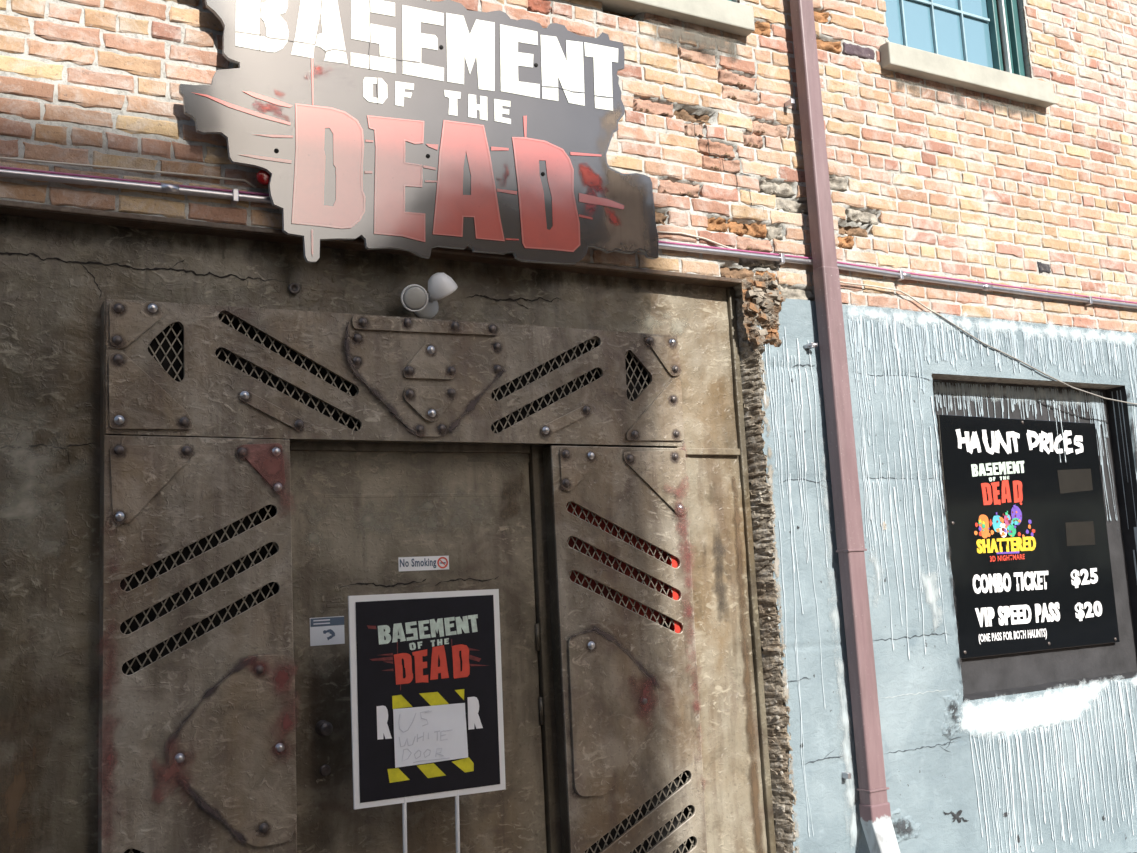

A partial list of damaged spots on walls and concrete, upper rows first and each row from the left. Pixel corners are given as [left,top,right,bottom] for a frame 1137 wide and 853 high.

spalling [633,99,788,174]
spalling [655,211,668,225]
spalling [657,179,700,198]
spalling [759,179,808,215]
crack [0,252,290,298]
crack [467,294,562,309]
spalling [706,217,814,853]
water stain [762,327,828,837]
spalling [941,689,963,740]
water stain [970,680,1137,853]